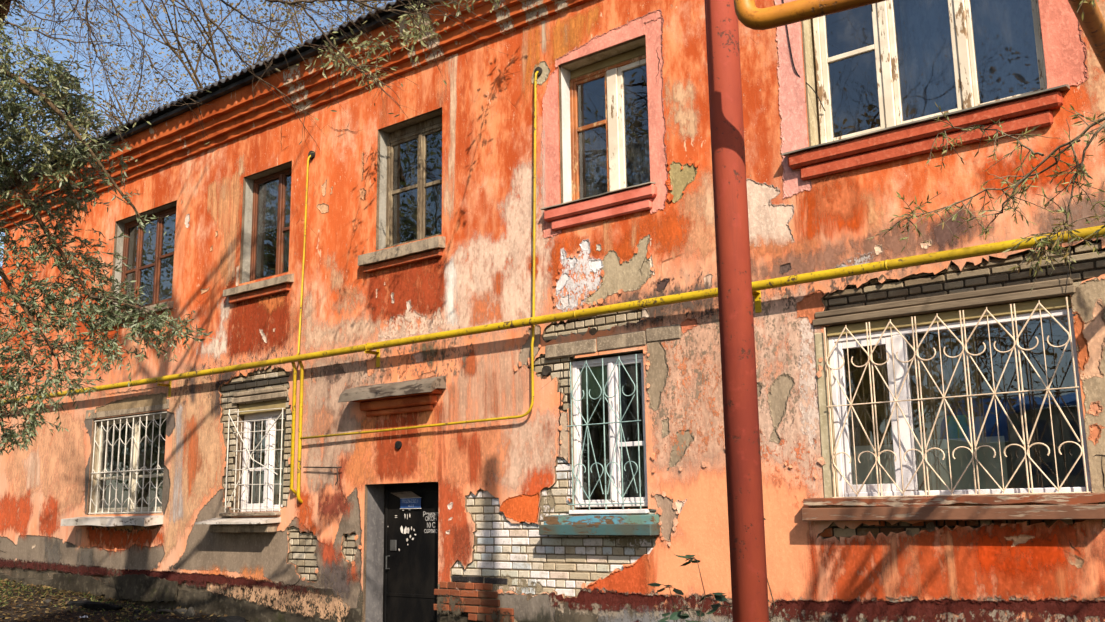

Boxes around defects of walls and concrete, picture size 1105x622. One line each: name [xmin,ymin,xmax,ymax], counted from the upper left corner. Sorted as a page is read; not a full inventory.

peeling [665,159,699,202]
flaking render [221,367,321,582]
flaking render [343,532,367,568]
flaking render [433,457,679,622]
peeling [514,239,652,412]
peeling [634,246,670,291]
peeling [643,308,725,476]
peeling [753,239,1105,503]